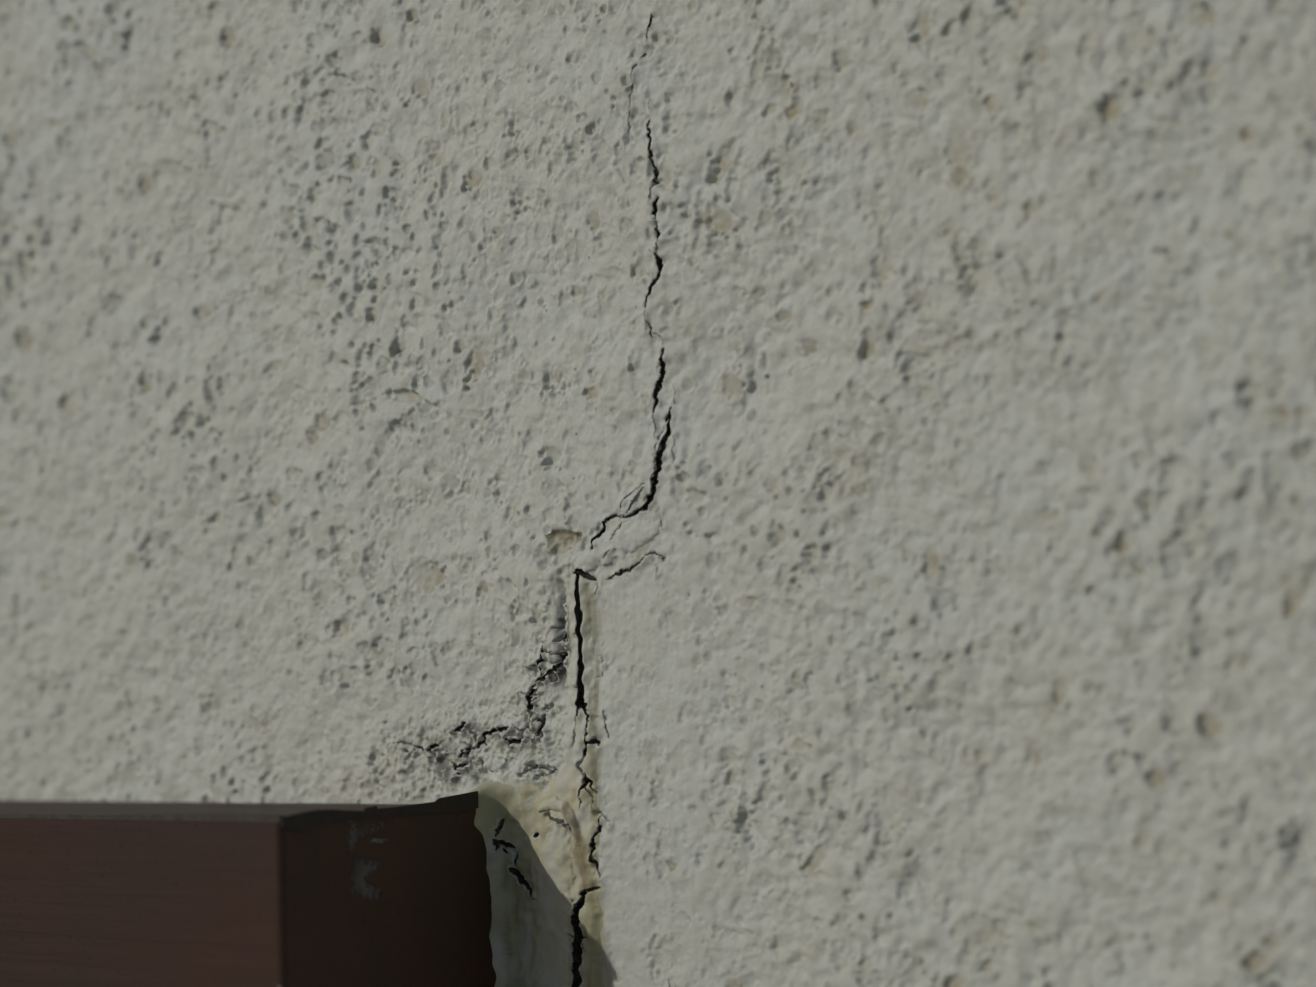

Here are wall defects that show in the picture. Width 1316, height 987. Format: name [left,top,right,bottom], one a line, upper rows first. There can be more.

crack [492,819,535,900]
crack [545,14,675,987]